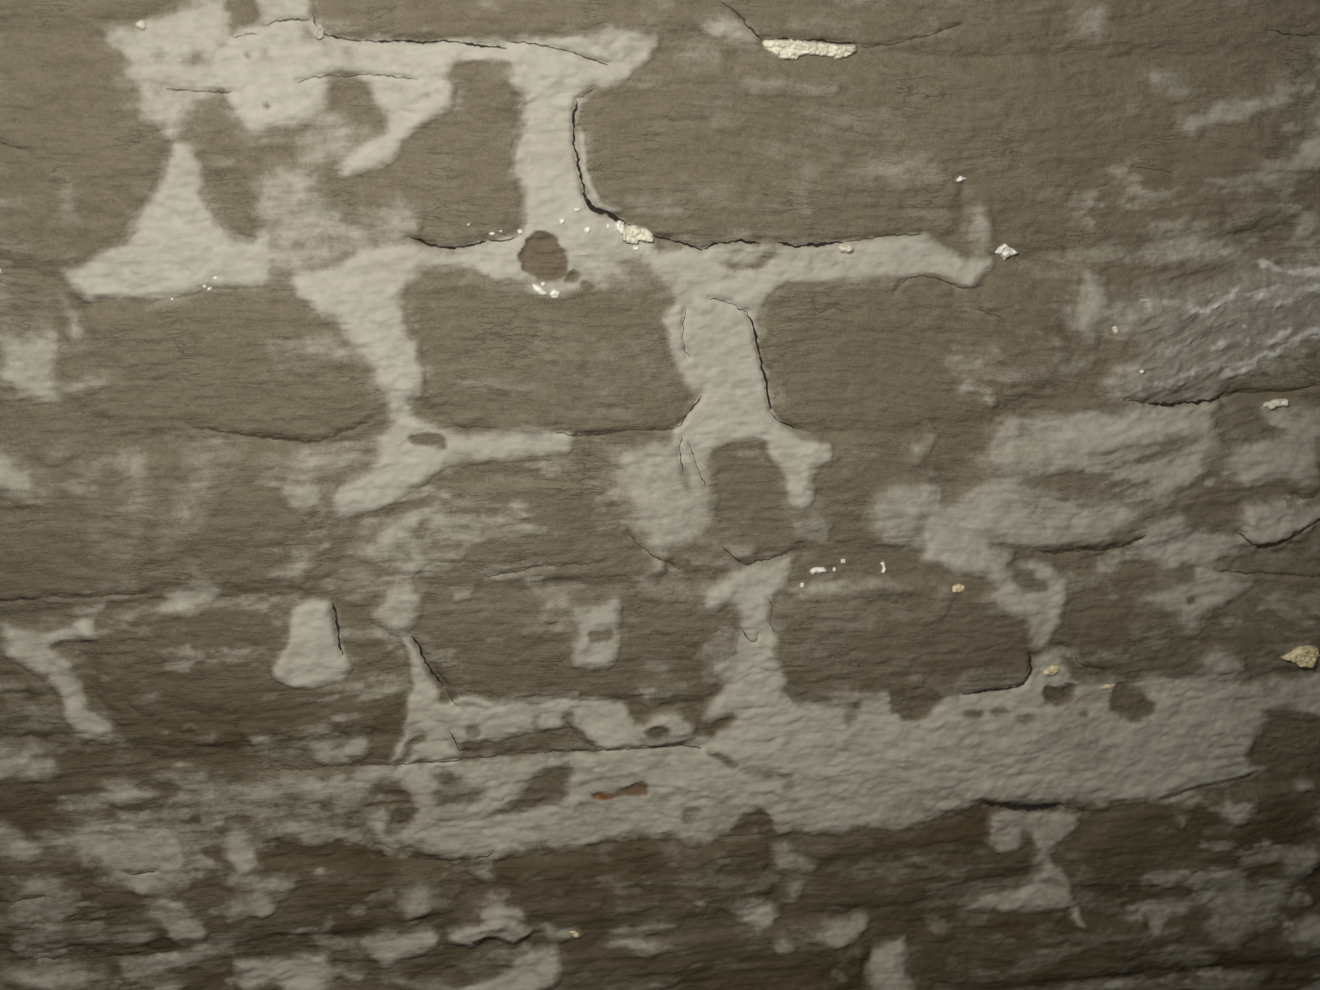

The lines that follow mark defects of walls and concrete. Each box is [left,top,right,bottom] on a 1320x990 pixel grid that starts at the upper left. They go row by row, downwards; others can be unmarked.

peeling [762,39,857,60]
crack [720,1,960,48]
crack [231,15,921,251]
spalling [489,208,595,299]
peeling [584,220,654,251]
crack [682,298,800,429]
crack [961,644,1108,695]
peeling [1281,646,1319,668]
crack [272,635,702,771]
spalling [887,681,945,722]
spalling [490,760,577,816]
rust [592,780,650,799]